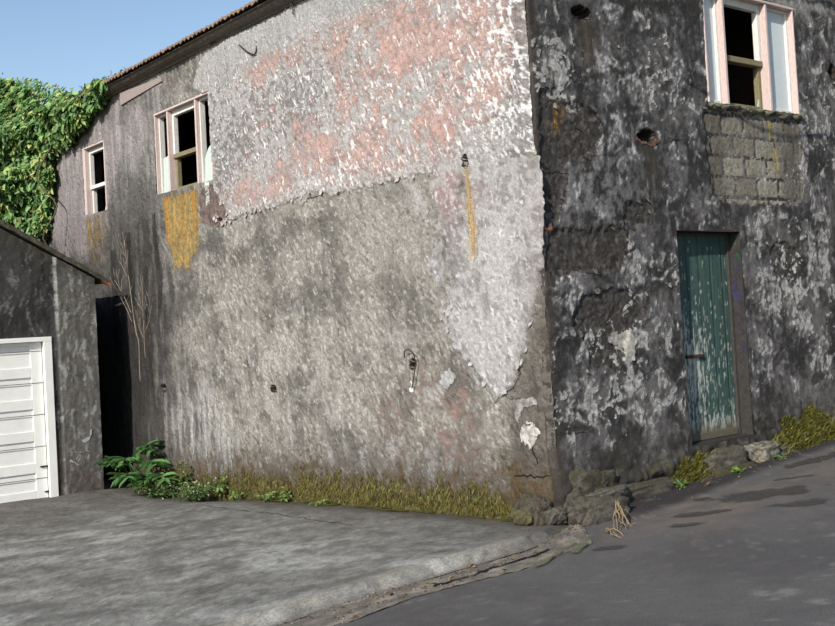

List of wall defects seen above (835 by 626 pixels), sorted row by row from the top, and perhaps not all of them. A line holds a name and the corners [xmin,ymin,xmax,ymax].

leakage [110,214,171,404]
peeling [198,0,686,444]
rust [463,167,478,262]
flaking render [624,20,835,366]
flaking render [520,421,541,449]